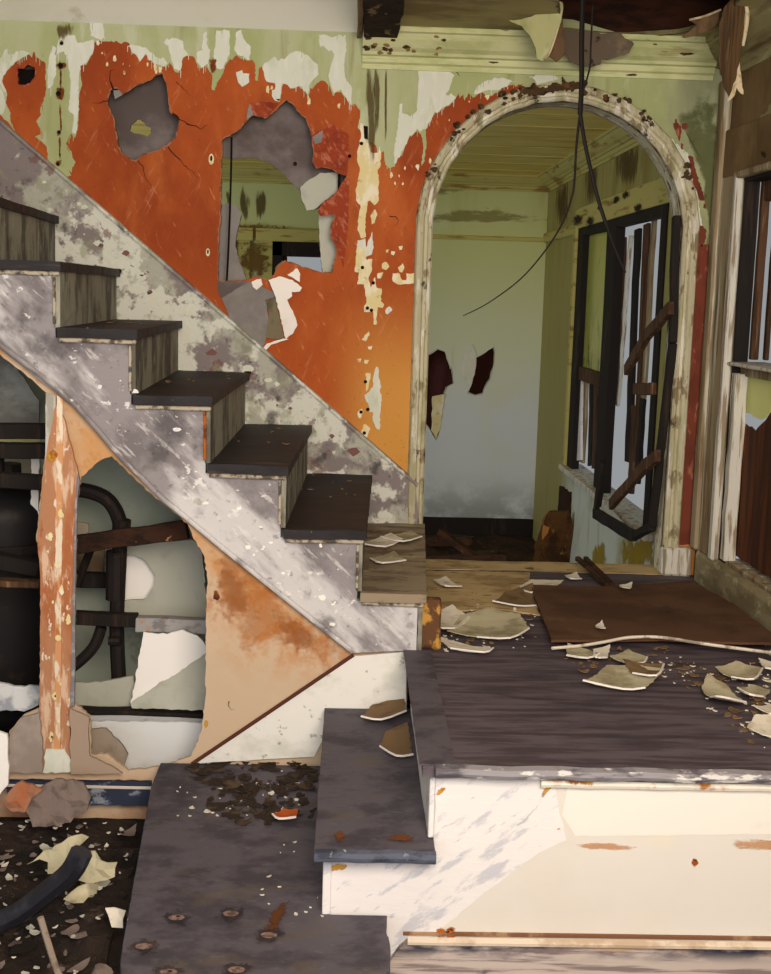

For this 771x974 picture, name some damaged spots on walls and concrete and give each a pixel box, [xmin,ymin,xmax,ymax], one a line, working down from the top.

peeling [0,19,722,440]
corrosion [736,840,771,849]